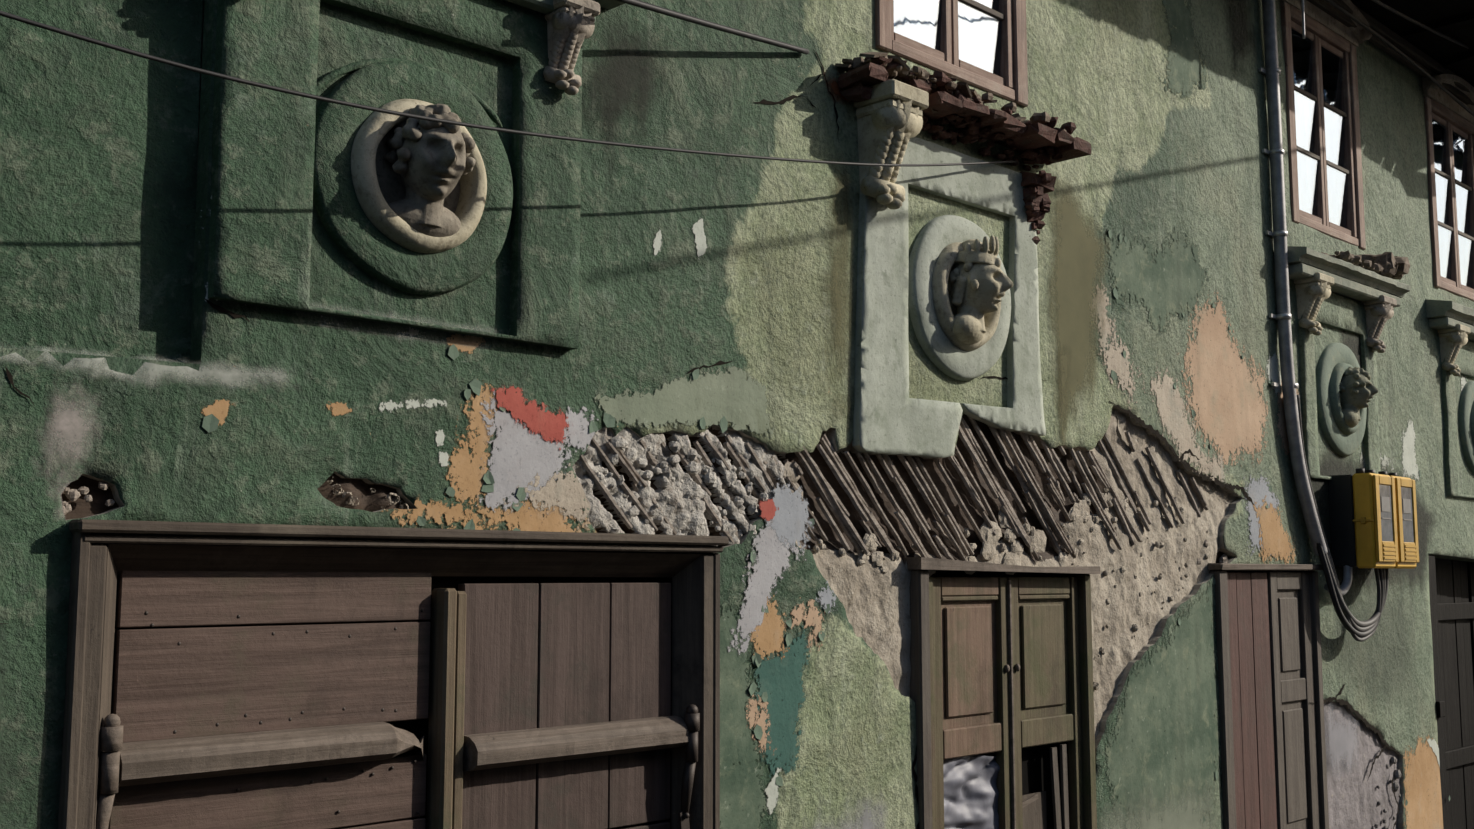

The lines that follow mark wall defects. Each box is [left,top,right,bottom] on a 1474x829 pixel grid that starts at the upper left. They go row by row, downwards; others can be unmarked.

spalling [61,475,119,520]
spalling [317,219,1302,829]
spalling [1324,702,1450,829]